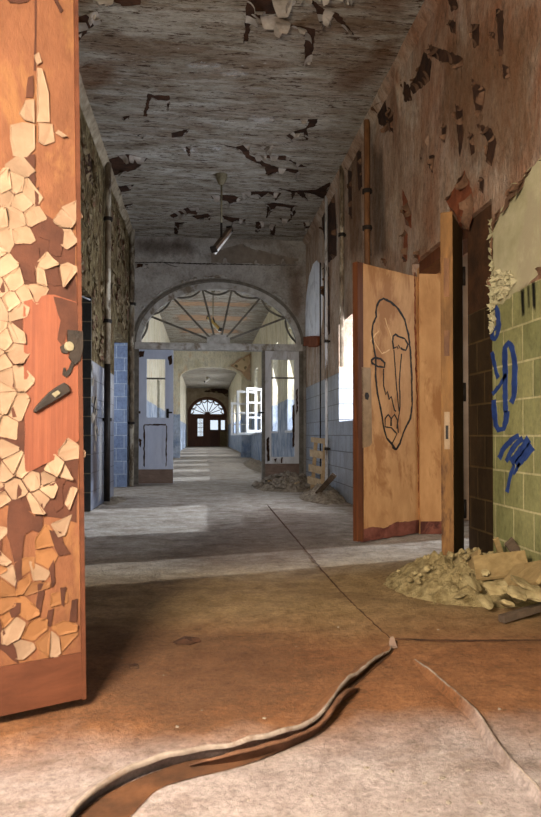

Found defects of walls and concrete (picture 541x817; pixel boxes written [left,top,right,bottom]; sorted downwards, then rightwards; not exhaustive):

spalling [78,0,141,41]
peeling [143,94,170,116]
peeling [243,0,354,66]
peeling [287,119,318,142]
peeling [371,101,393,133]
peeling [400,45,463,102]
peeling [439,78,497,166]
peeling [469,8,510,79]
peeling [445,170,484,230]
peeling [485,158,541,334]
peeling [0,52,148,664]
crack [50,506,541,817]